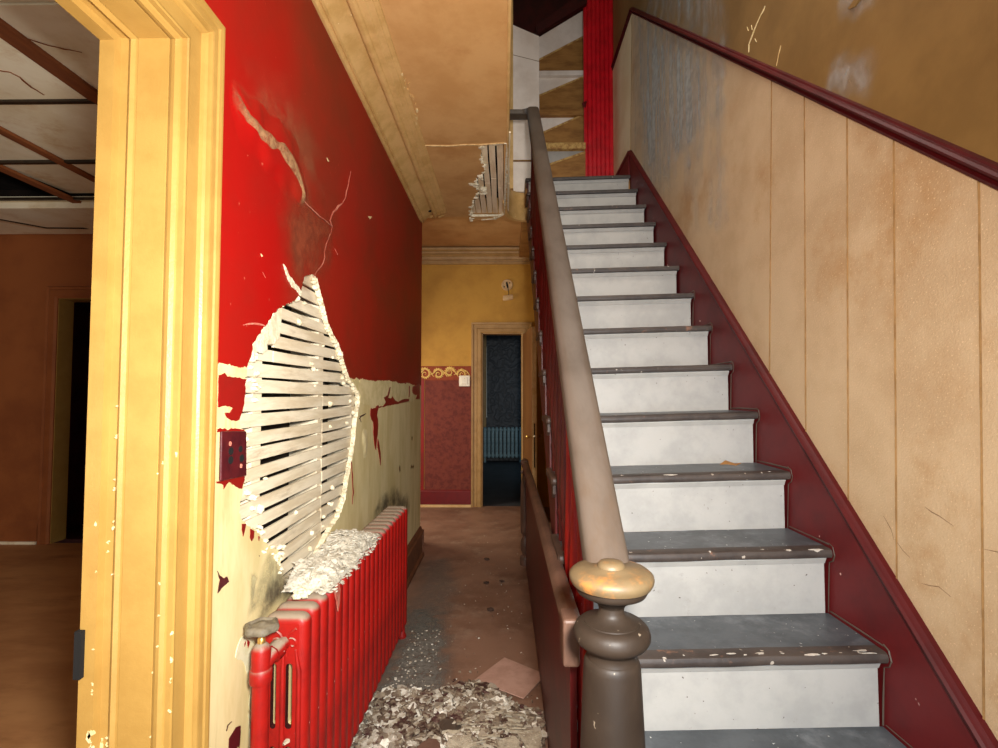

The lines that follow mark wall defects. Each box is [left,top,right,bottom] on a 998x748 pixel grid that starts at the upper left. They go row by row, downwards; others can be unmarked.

crack [20,34,82,53]
crack [0,70,44,95]
spalling [468,144,504,199]
crack [304,172,351,276]
flaking render [216,264,360,583]
damp [251,556,284,608]
peeling [86,730,108,748]